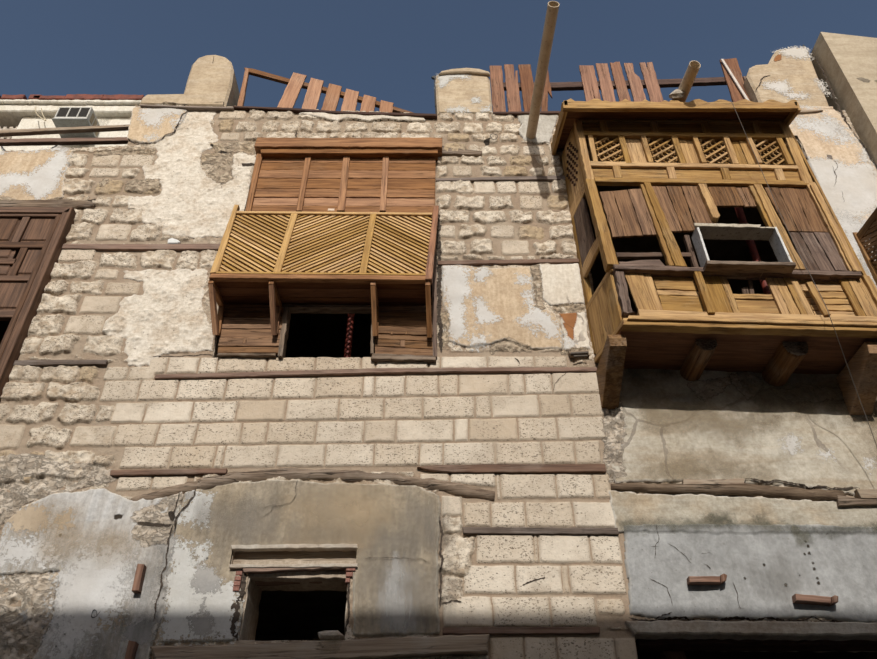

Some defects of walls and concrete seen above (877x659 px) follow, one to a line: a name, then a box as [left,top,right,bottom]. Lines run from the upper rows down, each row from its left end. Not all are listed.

peeling [0,145,96,202]
spalling [200,138,257,187]
peeling [437,264,589,355]
spalling [601,401,627,483]
peeling [0,453,245,659]
crack [153,489,196,622]
crack [629,579,842,622]